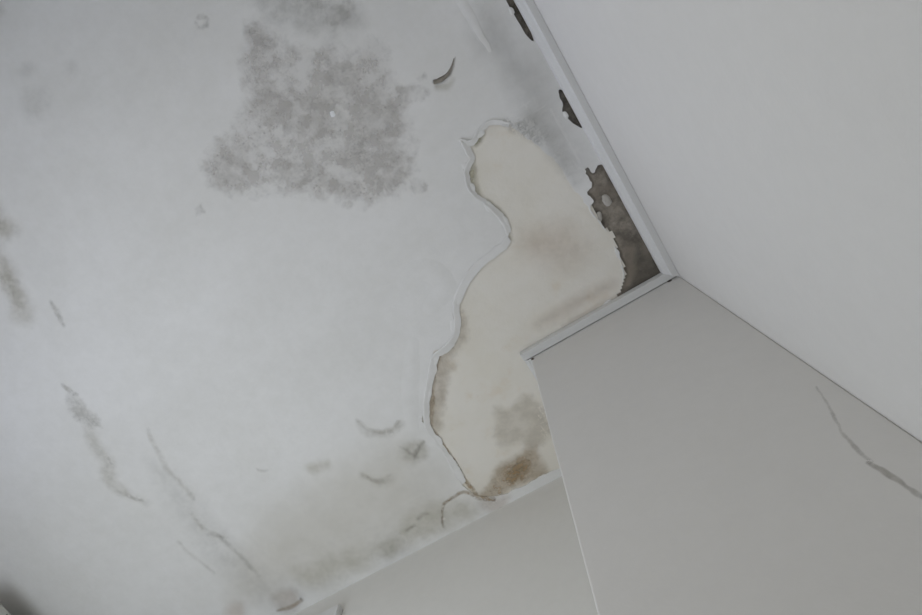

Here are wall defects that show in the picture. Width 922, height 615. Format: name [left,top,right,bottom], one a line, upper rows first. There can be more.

spalling [506,0,533,41]
peeling [433,59,454,84]
spalling [559,90,582,128]
peeling [422,119,661,497]